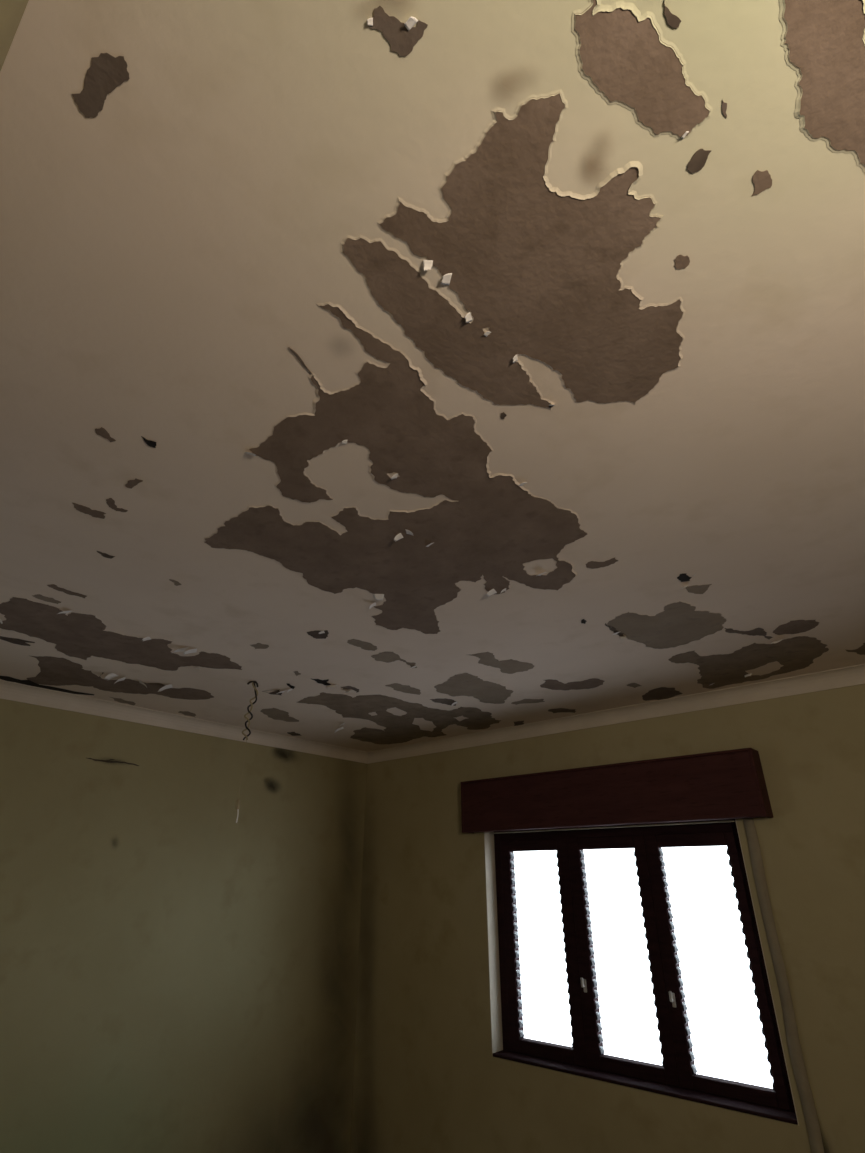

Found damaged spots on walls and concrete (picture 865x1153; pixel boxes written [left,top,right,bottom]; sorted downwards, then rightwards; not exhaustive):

peeling [367,6,428,57]
peeling [571,0,727,140]
peeling [779,0,865,173]
spalling [687,149,711,173]
peeling [674,255,690,269]
peeling [203,89,686,634]
crack [0,636,35,646]
crack [0,676,94,695]
peeling [0,584,243,717]
peeling [260,652,605,744]
peeling [605,573,829,689]